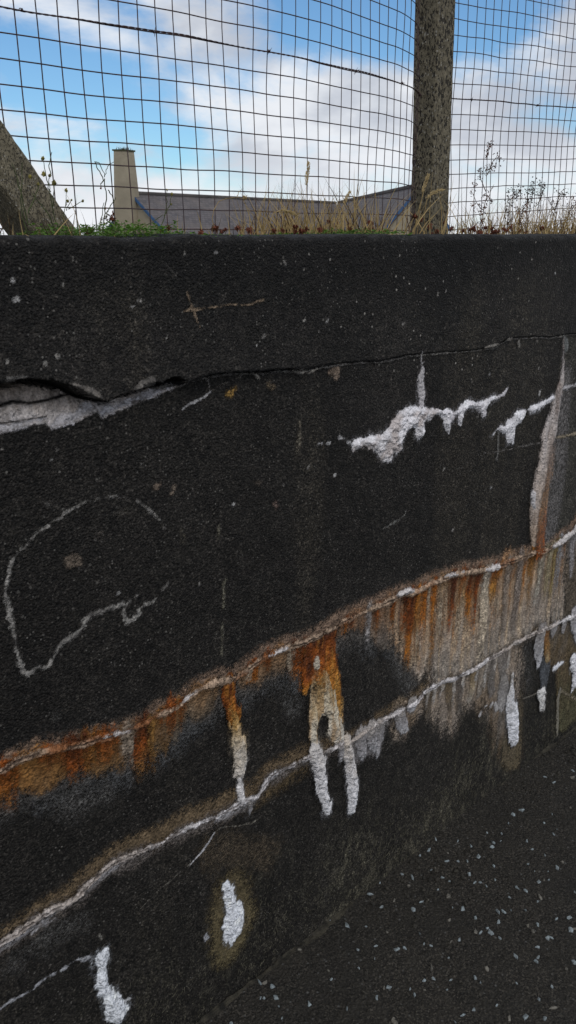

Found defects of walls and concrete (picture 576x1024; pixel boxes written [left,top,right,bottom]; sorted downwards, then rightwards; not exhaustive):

spalling [0,376,178,434]
crack [149,333,576,410]
water stain [317,351,508,463]
crack [109,495,164,530]
crack [0,502,576,774]
rust [335,532,568,689]
water stain [389,333,576,774]
rust [0,636,309,822]
crack [0,614,576,956]
water stain [266,630,359,815]
water stain [0,916,131,1024]
water stain [200,833,279,968]